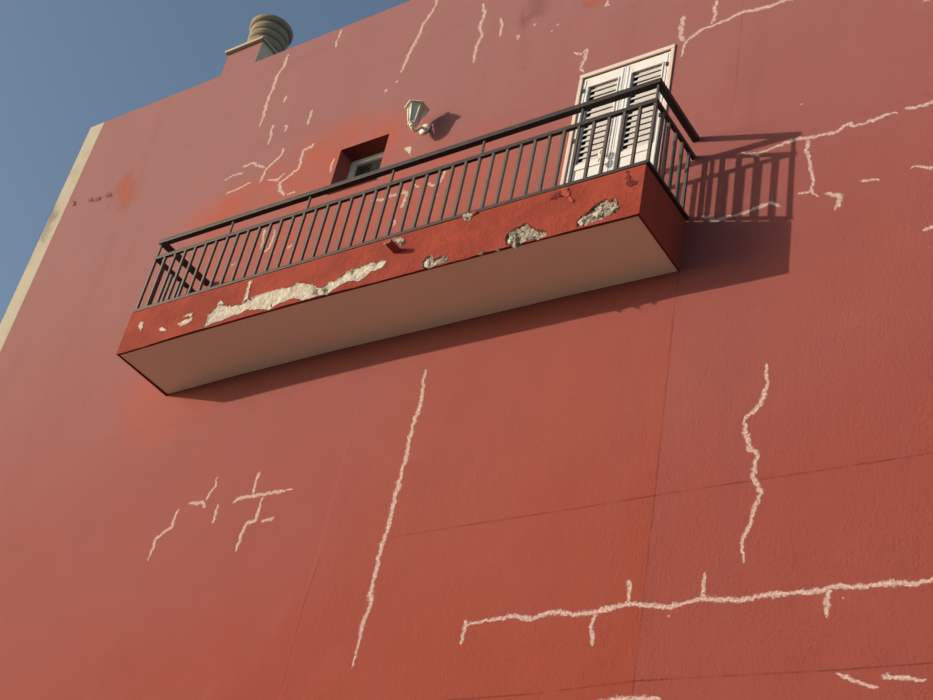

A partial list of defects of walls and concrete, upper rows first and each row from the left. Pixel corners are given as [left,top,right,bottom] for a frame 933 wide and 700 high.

crack [678,0,793,57]
crack [224,54,315,196]
crack [700,100,933,222]
spalling [204,259,386,327]
spalling [422,255,449,269]
spalling [478,223,548,255]
spalling [577,198,619,226]
crack [739,364,770,563]
crack [147,472,293,561]
crack [352,370,427,666]
crack [459,573,933,646]
crack [836,673,926,689]